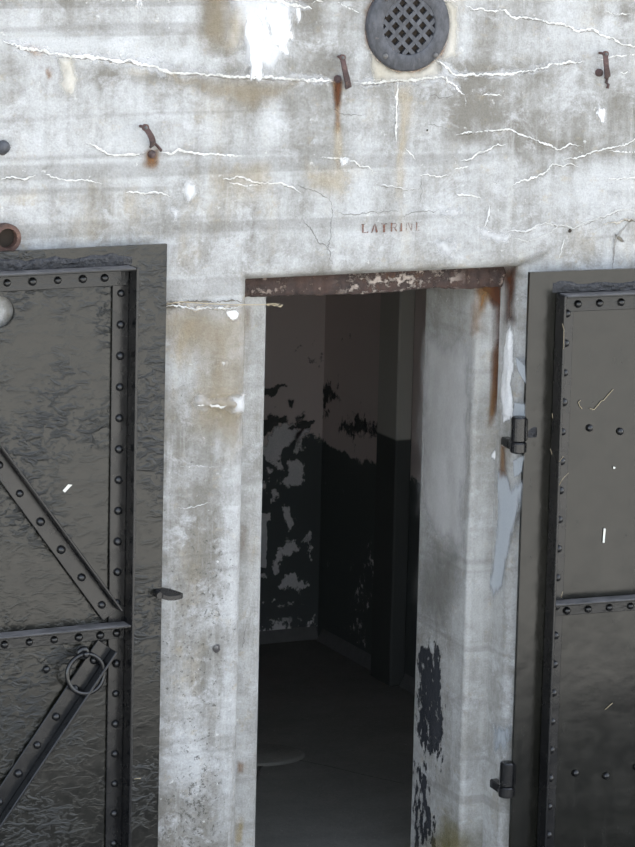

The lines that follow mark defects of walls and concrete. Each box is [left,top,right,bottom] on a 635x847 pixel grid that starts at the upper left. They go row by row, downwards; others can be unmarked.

crack [2,173,101,184]
crack [3,40,333,84]
crack [88,0,635,265]
rust [478,267,515,420]
peeling [261,381,340,592]
peeling [339,413,377,440]
peeling [259,598,316,631]
peeling [412,642,446,847]